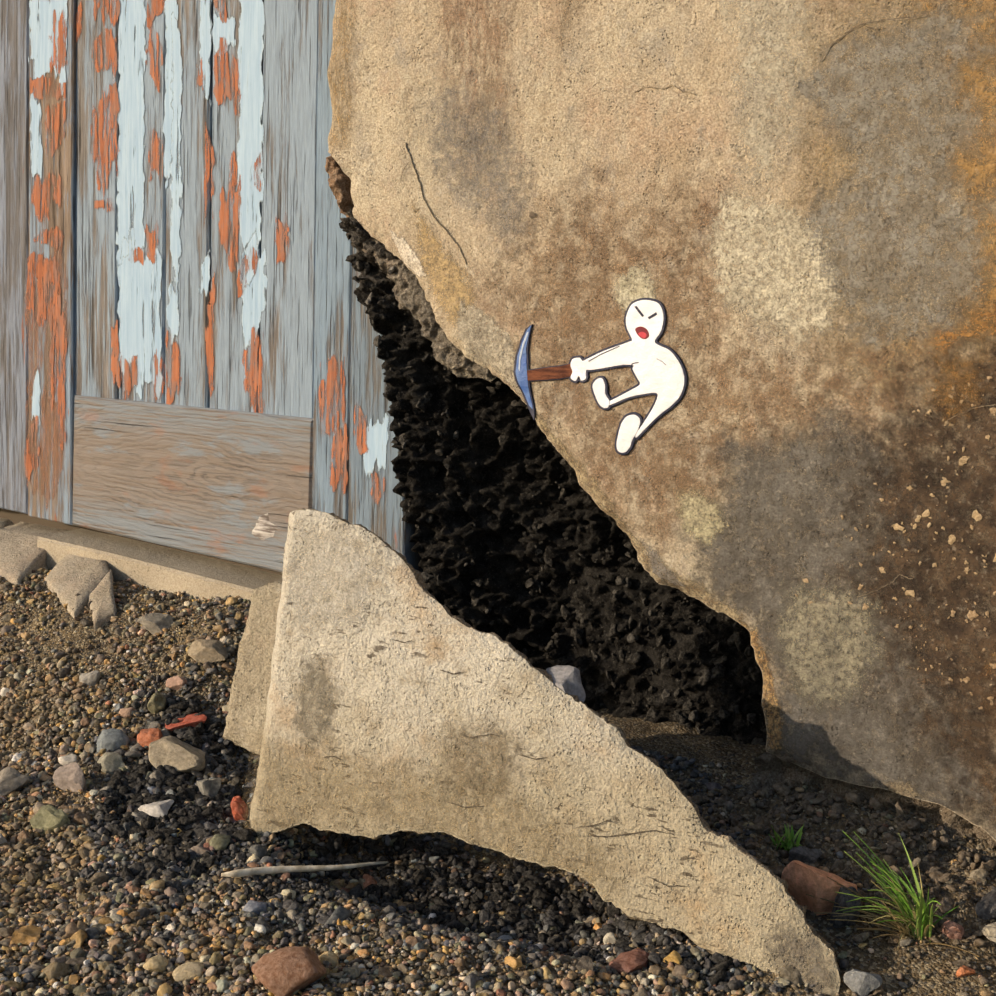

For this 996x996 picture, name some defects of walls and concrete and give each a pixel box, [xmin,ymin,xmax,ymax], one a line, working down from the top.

crack [634,82,695,95]
crack [821,15,927,62]
peeling [24,0,183,511]
peeling [196,0,289,413]
crack [401,142,466,264]
leakage [509,0,996,840]
spalling [297,155,841,983]
flaking render [873,446,996,585]
flaking render [892,587,996,709]